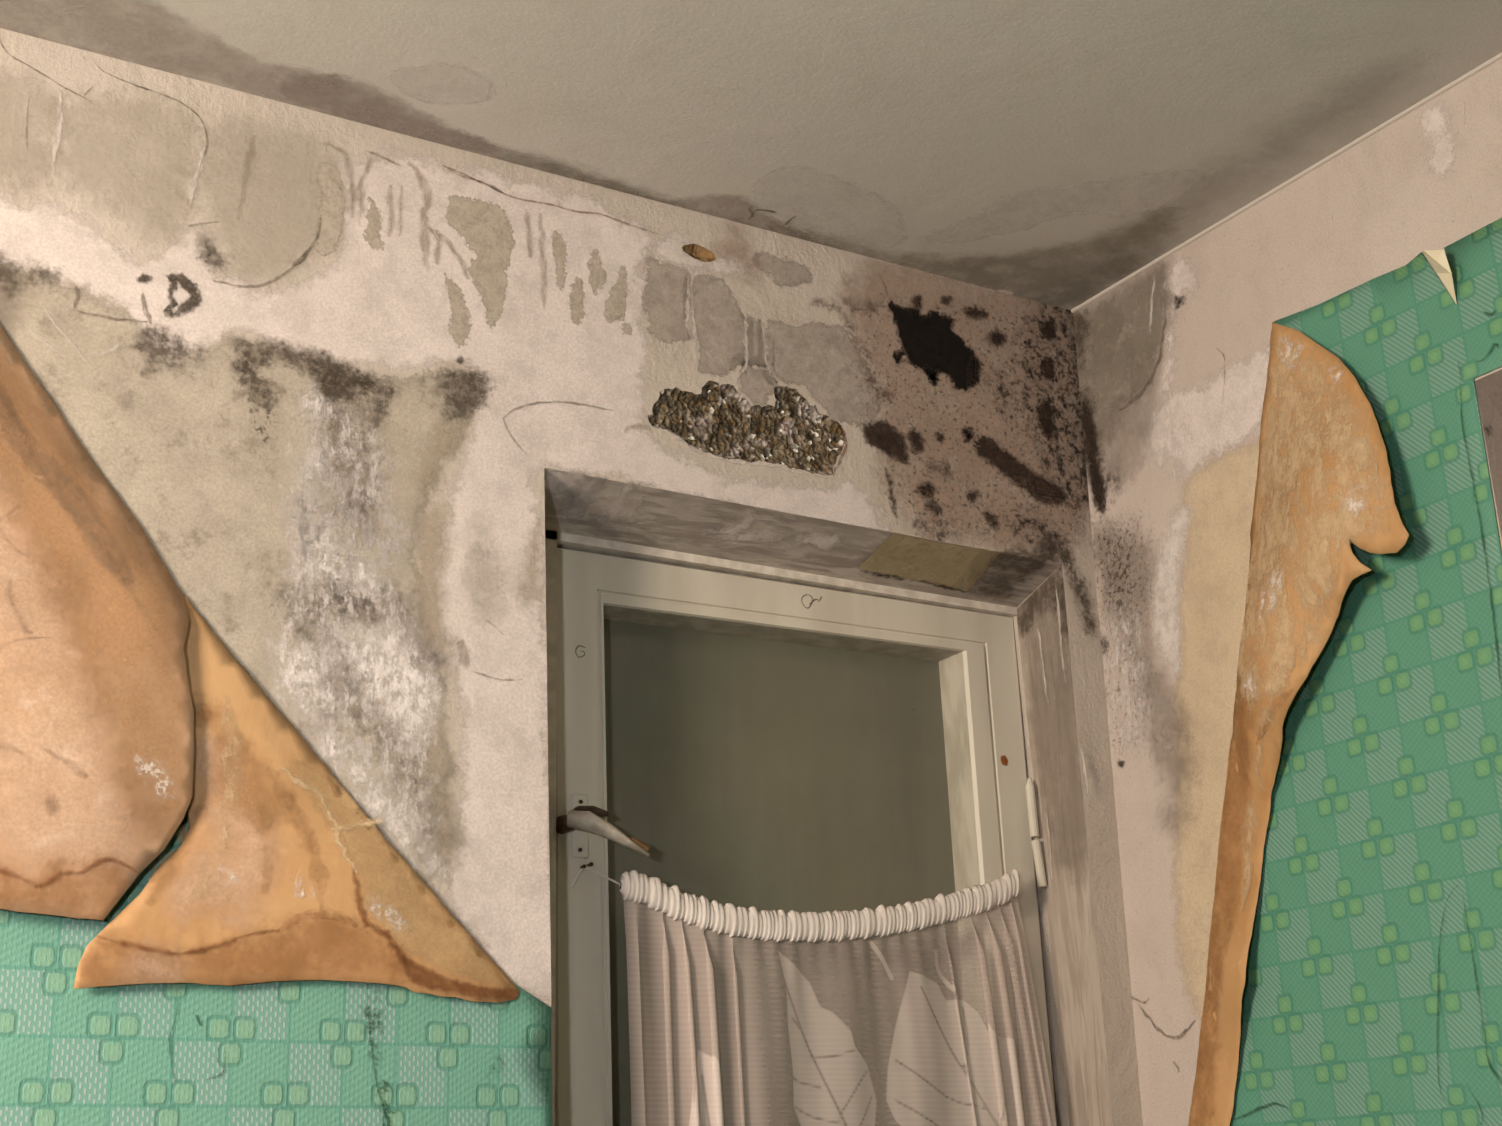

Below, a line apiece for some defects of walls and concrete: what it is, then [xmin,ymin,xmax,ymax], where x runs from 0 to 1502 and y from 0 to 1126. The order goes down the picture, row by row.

damp [0,0,503,160]
damp [136,273,202,372]
peeling [363,197,384,251]
damp [436,357,489,453]
peeling [444,194,515,348]
peeling [552,231,880,478]
damp [711,198,807,240]
damp [839,255,1198,767]
peeling [0,265,520,1003]
damp [233,340,452,878]
peeling [1146,322,1409,1126]
crack [365,1000,393,1126]